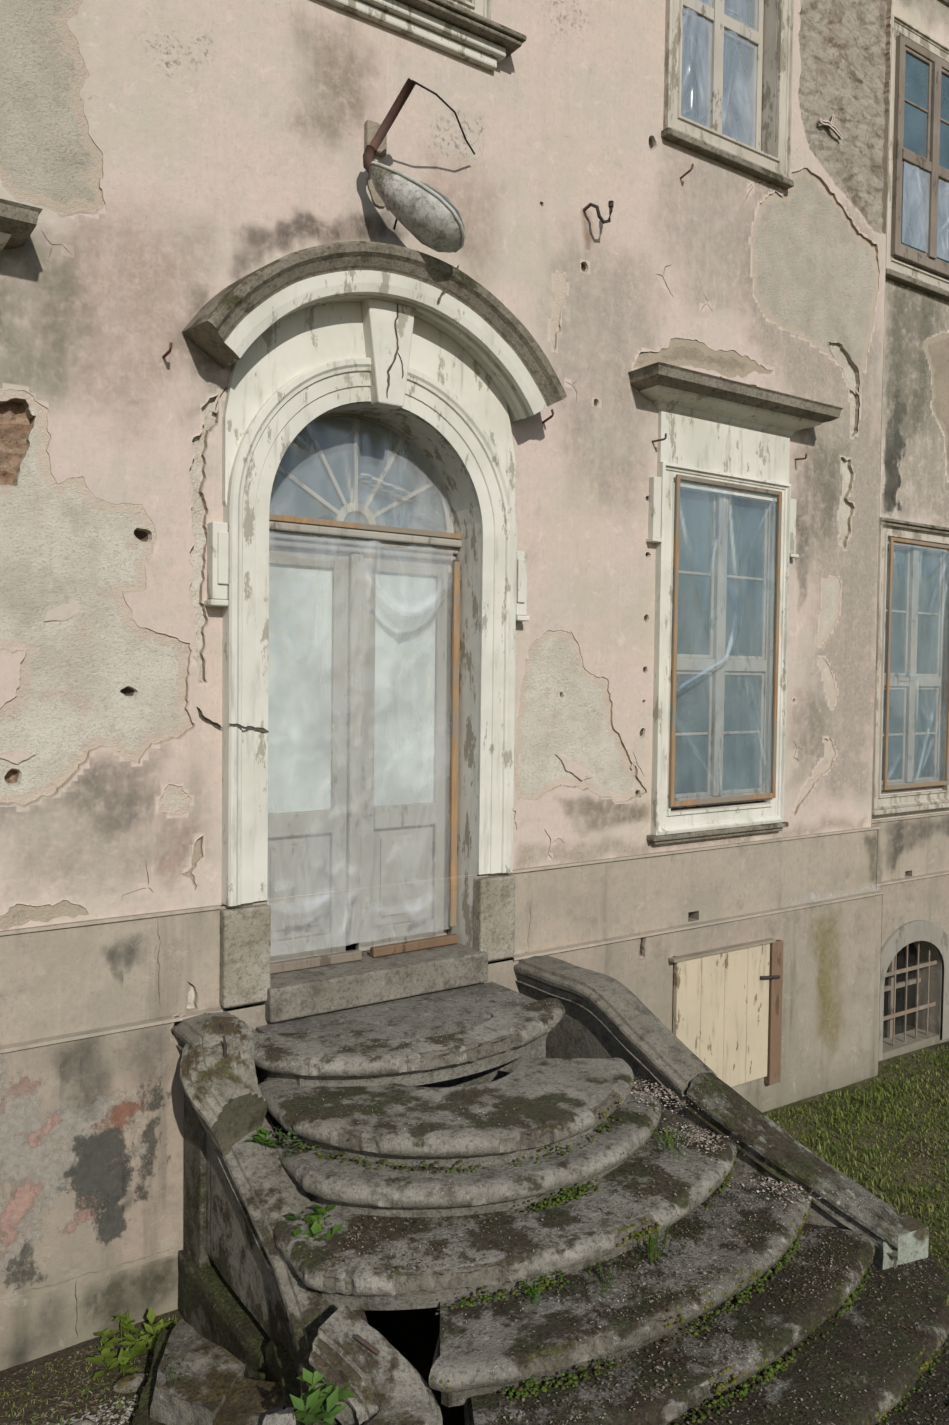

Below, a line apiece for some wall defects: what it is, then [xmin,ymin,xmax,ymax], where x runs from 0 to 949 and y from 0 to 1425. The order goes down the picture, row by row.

crack [386,303,404,398]
flaking render [633,337,775,378]
flaking render [750,167,880,395]
leakage [884,282,937,511]
flaking render [894,300,949,520]
flaking render [0,389,196,808]
flaking render [514,629,648,803]
leakage [0,1053,171,1285]